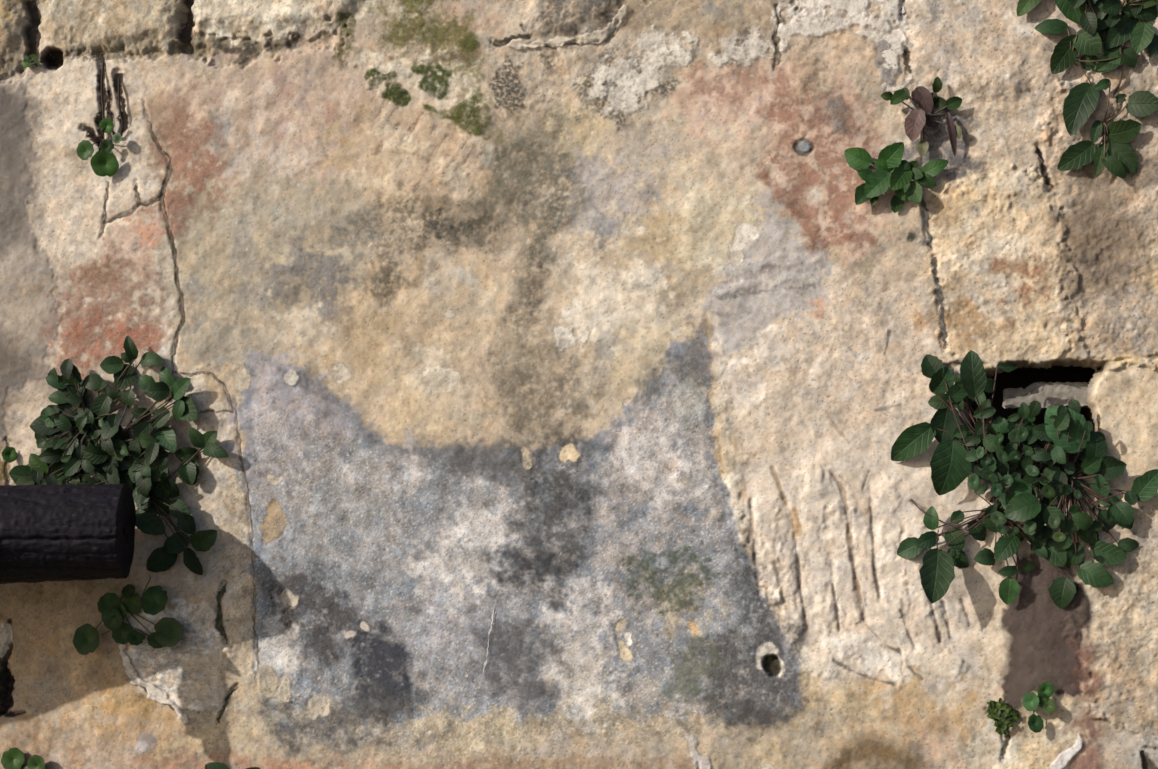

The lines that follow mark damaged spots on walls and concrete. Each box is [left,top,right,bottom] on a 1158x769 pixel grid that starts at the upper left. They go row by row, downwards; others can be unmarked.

leakage [371,135,570,322]
crack [82,54,259,724]
leakage [636,355,706,401]
leakage [442,357,591,608]
flaking render [0,623,13,658]
flaking render [119,644,189,724]
leakage [262,573,419,753]
leakage [475,618,552,705]
leakage [662,553,807,725]
leakage [1002,553,1092,709]